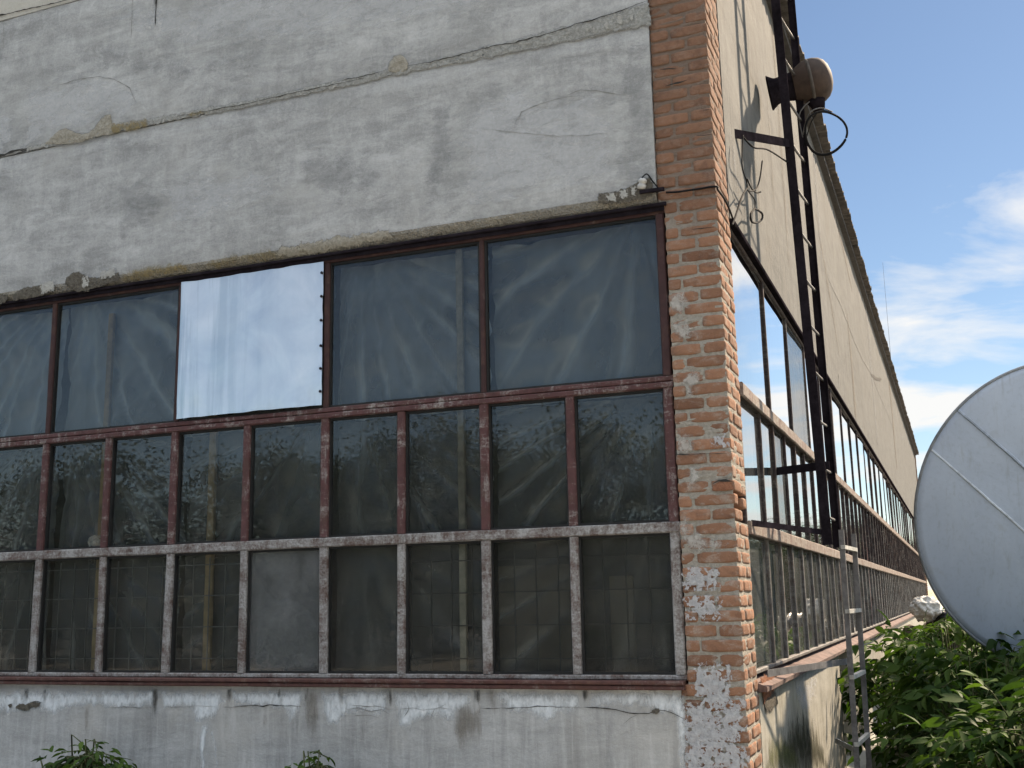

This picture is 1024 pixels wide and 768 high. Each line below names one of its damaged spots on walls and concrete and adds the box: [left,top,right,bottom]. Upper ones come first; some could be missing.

spalling [45,114,114,146]
crack [483,90,621,137]
spalling [597,178,653,204]
spalling [272,229,393,258]
spalling [0,268,120,305]
peeling [681,566,725,623]
water stain [0,690,300,768]
water stain [324,691,479,725]
crack [483,706,682,722]
water stain [500,691,686,753]
peeling [682,661,750,768]